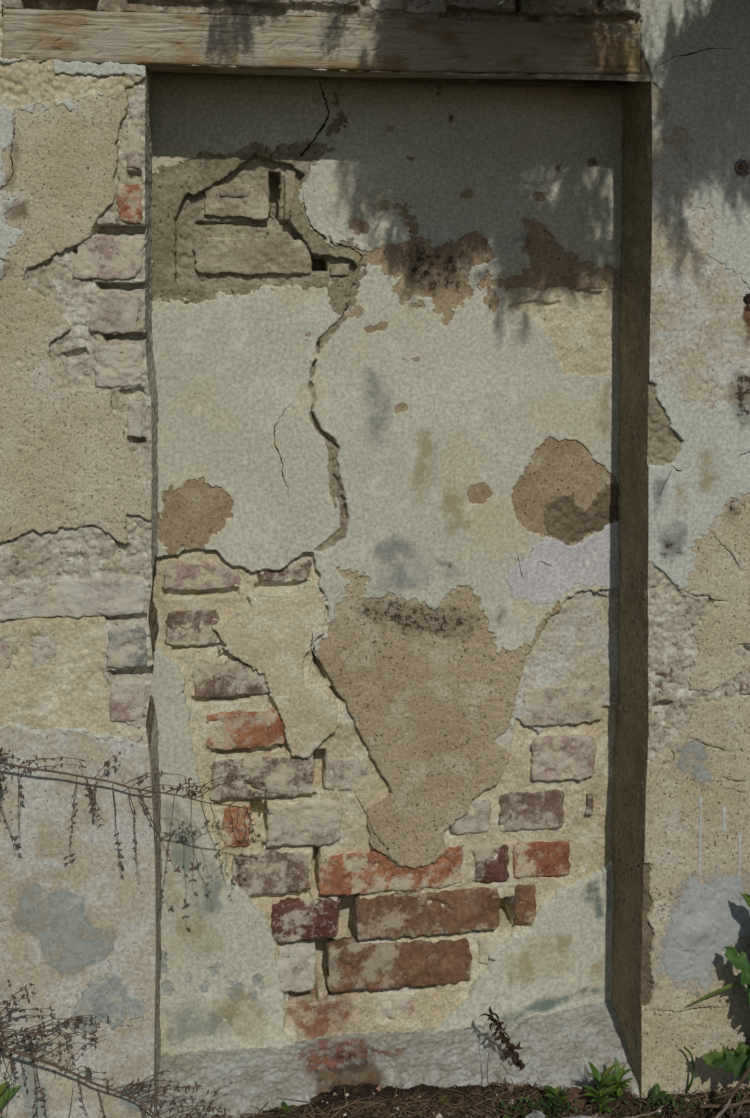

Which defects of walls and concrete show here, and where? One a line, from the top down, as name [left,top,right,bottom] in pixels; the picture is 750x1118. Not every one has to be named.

crack [273,79,363,555]
spalling [0,0,641,57]
peeling [300,55,750,466]
spalling [0,54,621,1118]
peeling [639,493,750,1098]